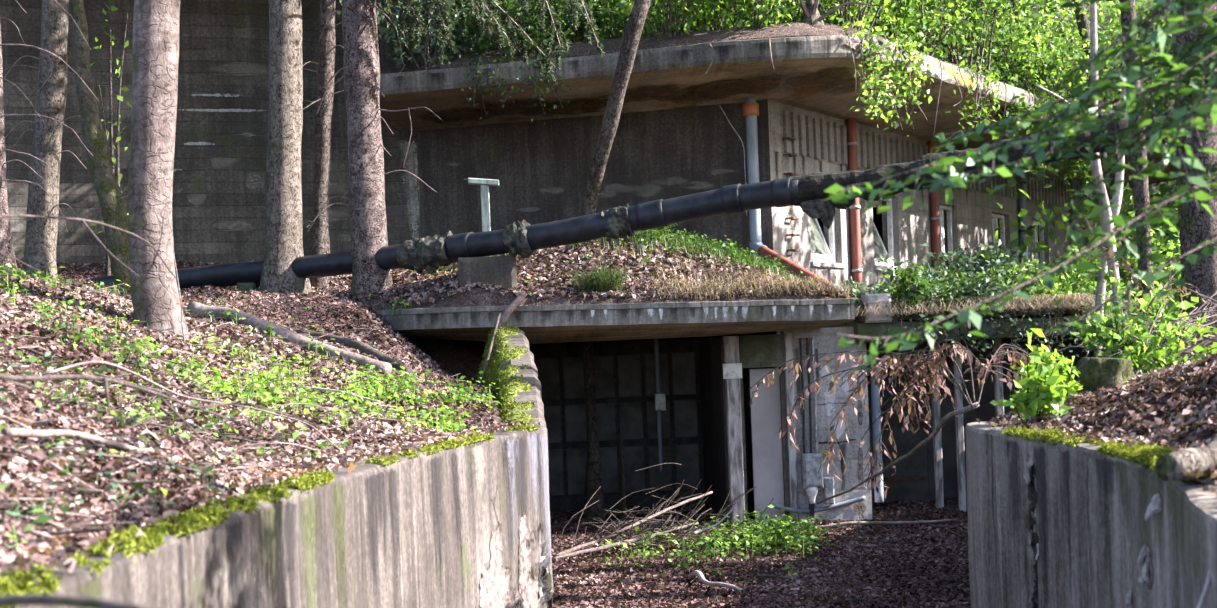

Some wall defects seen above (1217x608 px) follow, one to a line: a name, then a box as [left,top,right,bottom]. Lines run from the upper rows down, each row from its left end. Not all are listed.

spalling [477,512,548,608]